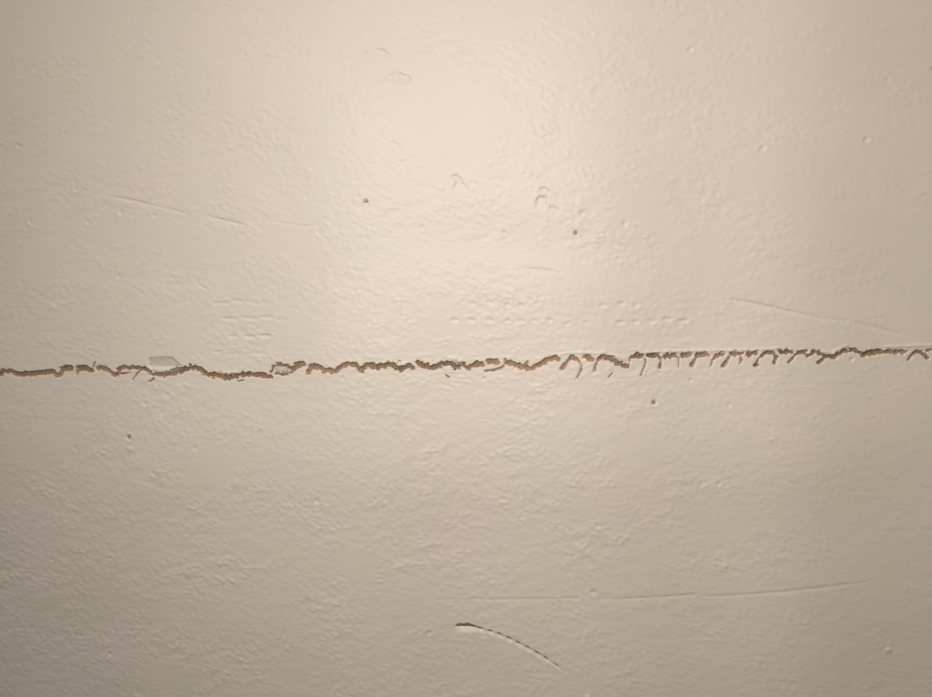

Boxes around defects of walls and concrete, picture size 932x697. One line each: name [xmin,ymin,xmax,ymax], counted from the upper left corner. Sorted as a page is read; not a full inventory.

crack [0,342,932,385]